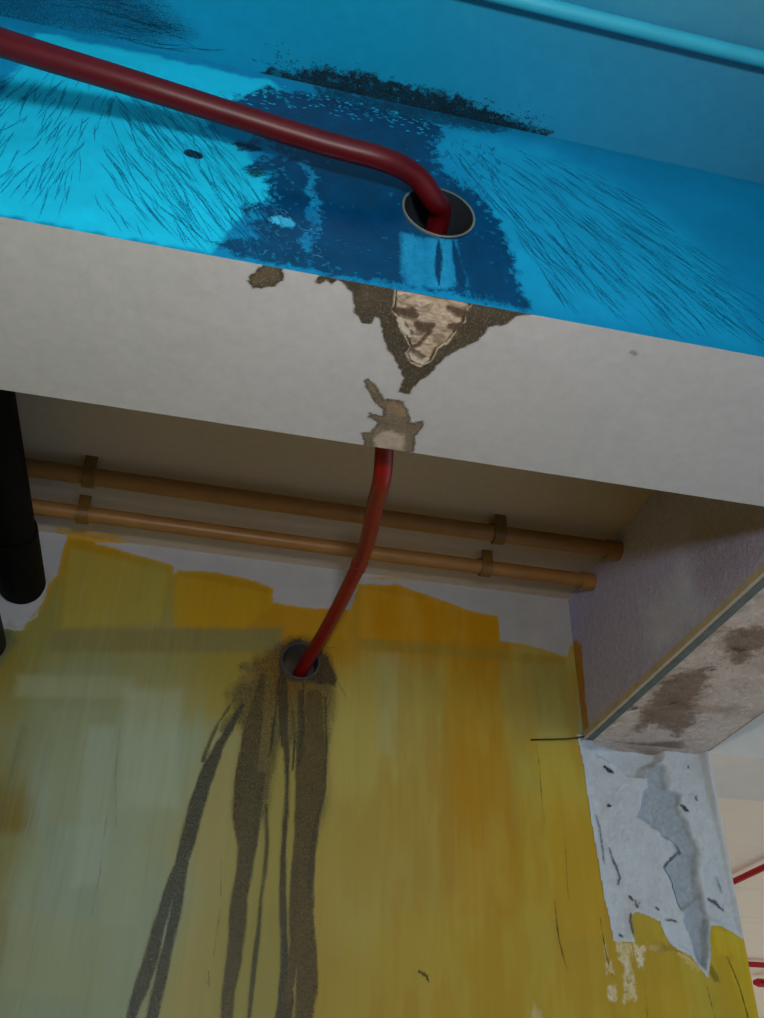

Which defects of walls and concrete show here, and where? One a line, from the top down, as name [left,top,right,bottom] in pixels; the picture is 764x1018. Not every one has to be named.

water stain [0,0,225,53]
water stain [210,43,555,313]
flaking render [314,275,530,453]
water stain [126,633,348,1018]
flaking render [577,734,744,1004]